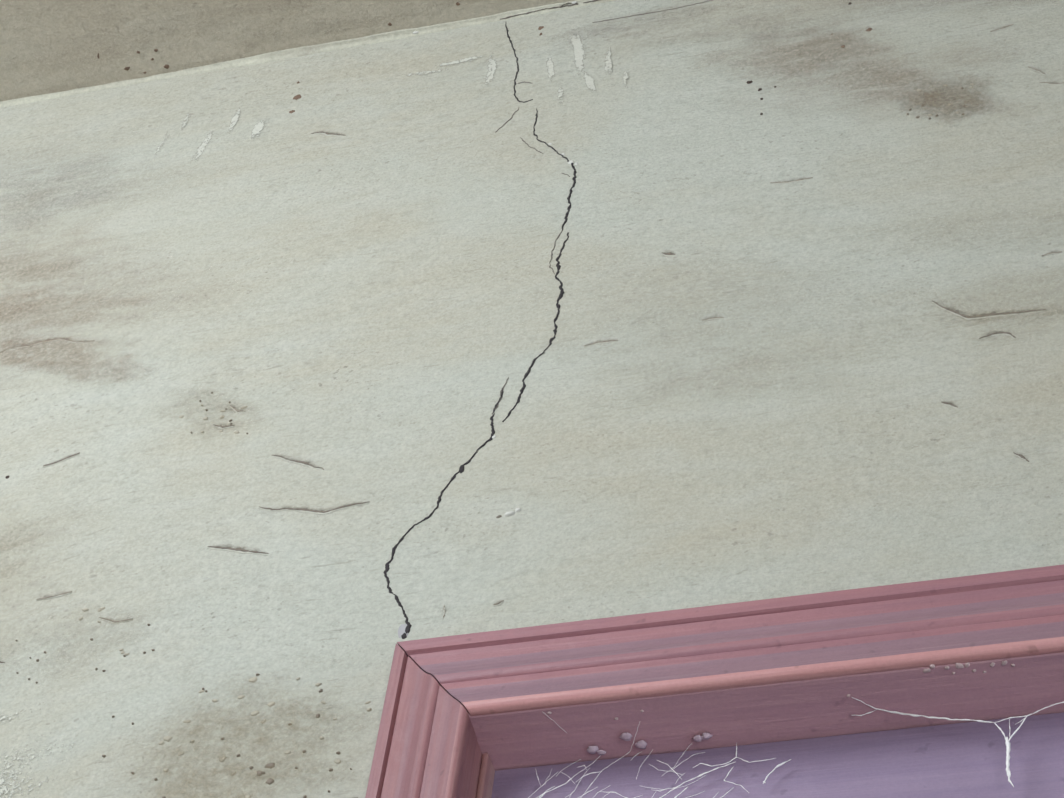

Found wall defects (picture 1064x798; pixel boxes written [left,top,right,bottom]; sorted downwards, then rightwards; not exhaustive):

crack [383,0,713,639]